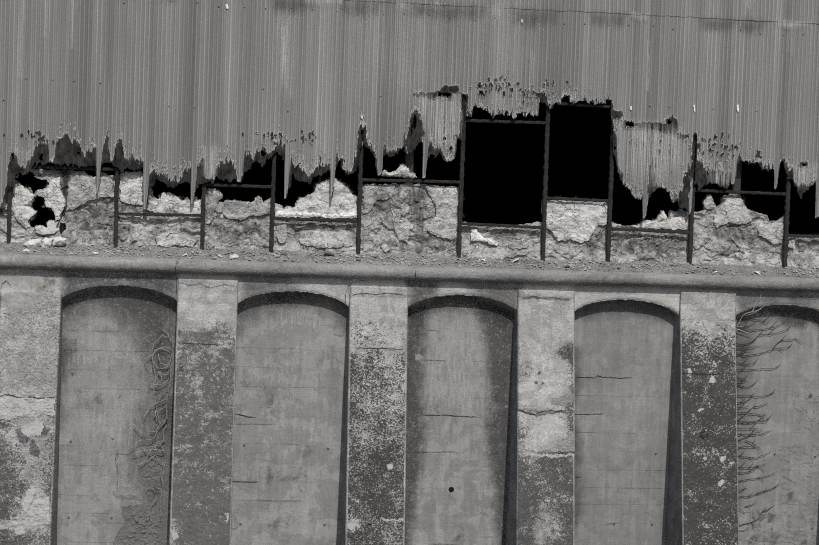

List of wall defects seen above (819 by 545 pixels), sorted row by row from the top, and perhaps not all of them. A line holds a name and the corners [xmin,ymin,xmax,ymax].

flaking render [155,232,196,264]
flaking render [12,171,396,243]
flaking render [299,230,353,248]
flaking render [391,209,411,243]
flaking render [425,186,458,239]
flaking render [470,229,498,246]
flaking render [546,200,608,243]
flaking render [636,196,797,252]